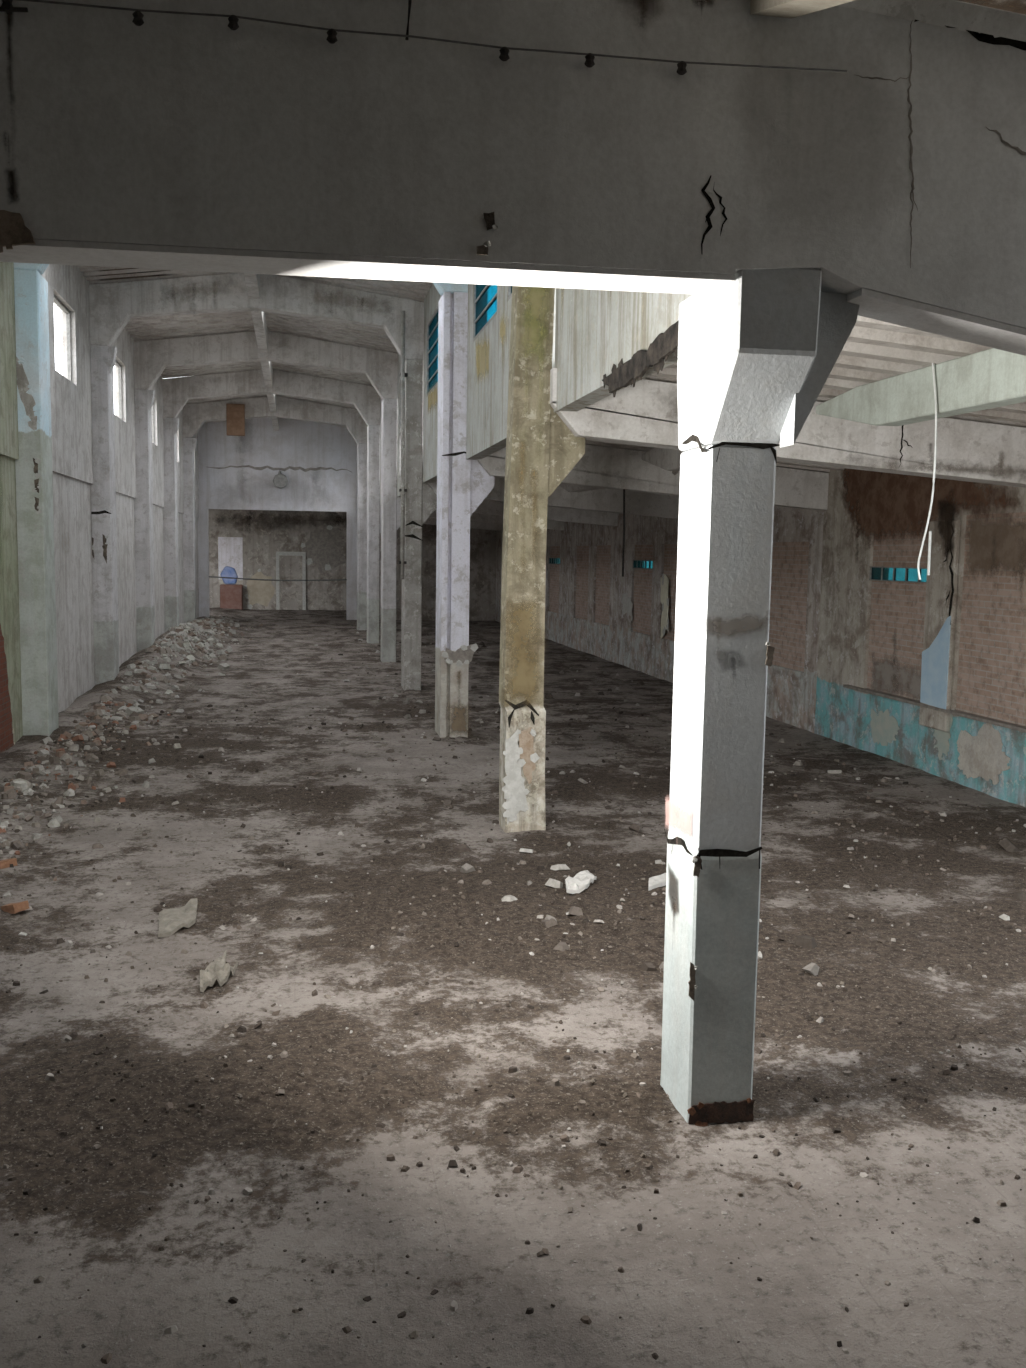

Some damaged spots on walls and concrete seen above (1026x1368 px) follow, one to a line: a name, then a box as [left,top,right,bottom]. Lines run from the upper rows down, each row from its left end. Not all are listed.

spalling [0,210,35,253]
crack [701,175,727,254]
spalling [602,320,679,397]
crack [505,700,539,727]
peeling [869,709,900,746]
peeling [931,708,1012,786]
crack [664,829,762,870]